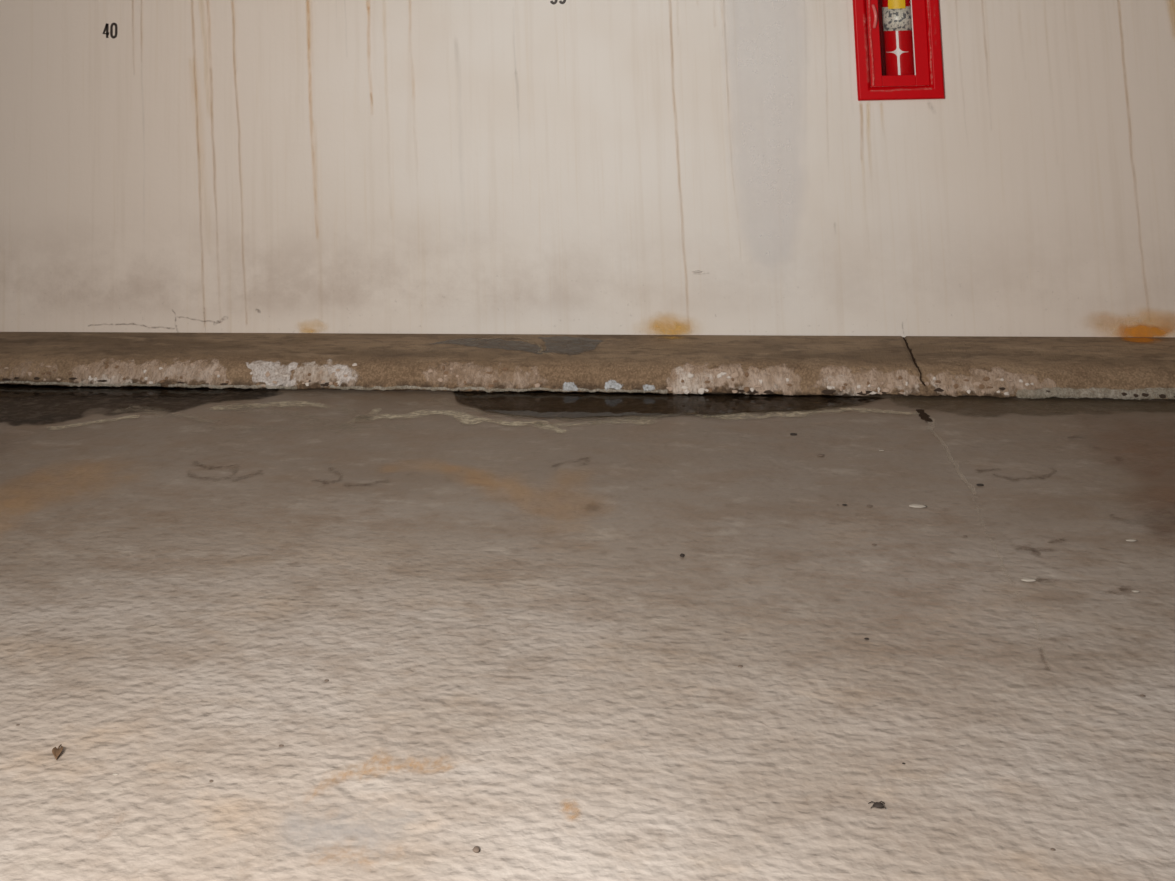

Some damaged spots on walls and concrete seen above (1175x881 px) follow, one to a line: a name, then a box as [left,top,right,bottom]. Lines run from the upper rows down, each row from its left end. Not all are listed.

rust [1124,325,1166,342]
damp [0,384,324,429]
damp [349,391,1175,433]
crack [903,337,974,489]